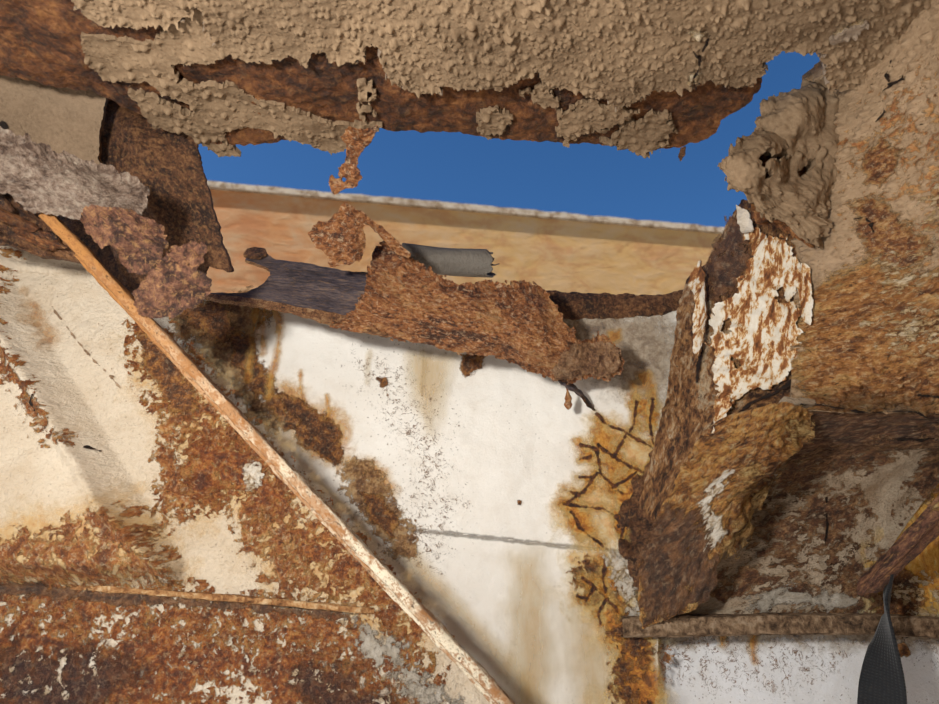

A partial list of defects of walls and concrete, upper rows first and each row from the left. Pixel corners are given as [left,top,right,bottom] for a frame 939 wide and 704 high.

corrosion [0,0,193,117]
corrosion [0,193,460,704]
corrosion [175,45,762,268]
crack [557,396,657,626]
peeling [687,30,707,41]
corrosion [557,37,939,704]
peeling [688,79,840,433]